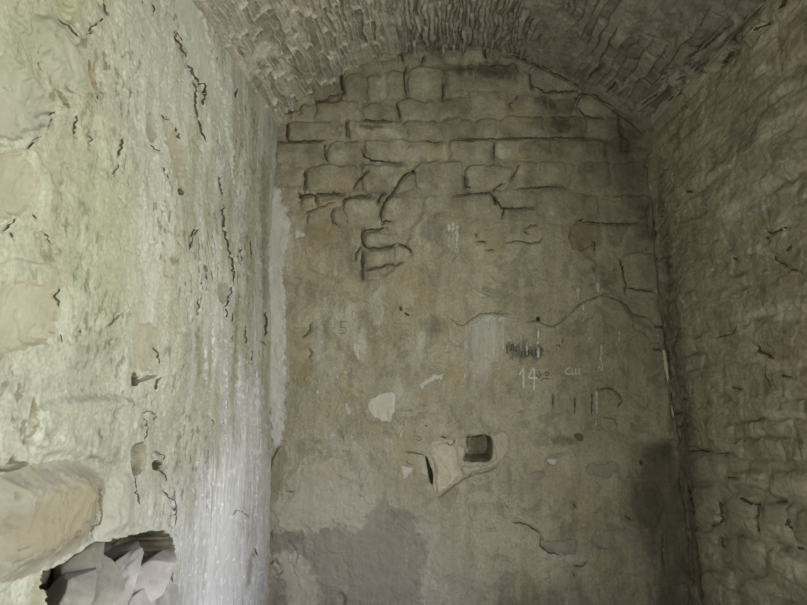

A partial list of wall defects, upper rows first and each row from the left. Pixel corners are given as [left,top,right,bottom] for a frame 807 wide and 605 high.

crack [174,31,207,142]
crack [277,125,327,160]
crack [298,149,414,277]
crack [456,164,556,250]
crack [531,259,663,327]
crack [152,347,161,390]
water stain [192,182,305,605]
crack [143,411,177,525]
spalling [425,456,433,485]
spalling [458,432,509,475]
water stain [295,470,443,605]
crack [513,522,559,555]